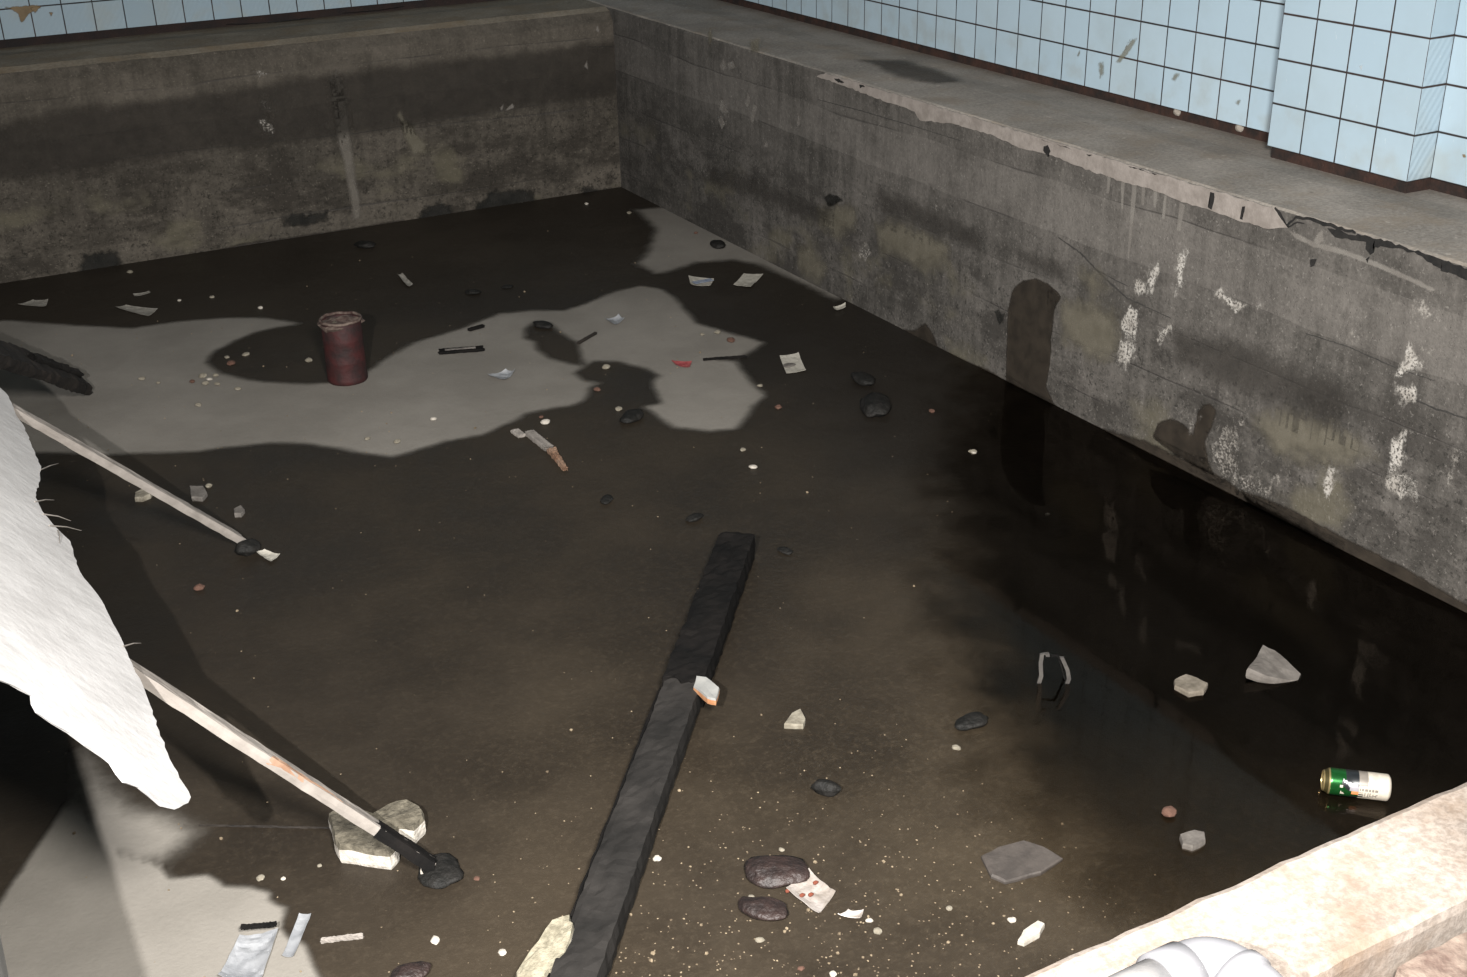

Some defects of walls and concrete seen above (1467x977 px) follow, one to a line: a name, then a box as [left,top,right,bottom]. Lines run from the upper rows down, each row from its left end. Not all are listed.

rust [6,5,52,22]
crack [1274,207,1356,234]
spalling [0,0,1467,605]
damp [1006,279,1061,407]
damp [1061,303,1138,369]
damp [1134,263,1159,294]
damp [1097,404,1256,504]
damp [1157,325,1360,497]
damp [1291,232,1434,319]
damp [1385,430,1417,498]
damp [1396,343,1430,402]
damp [1244,493,1467,614]